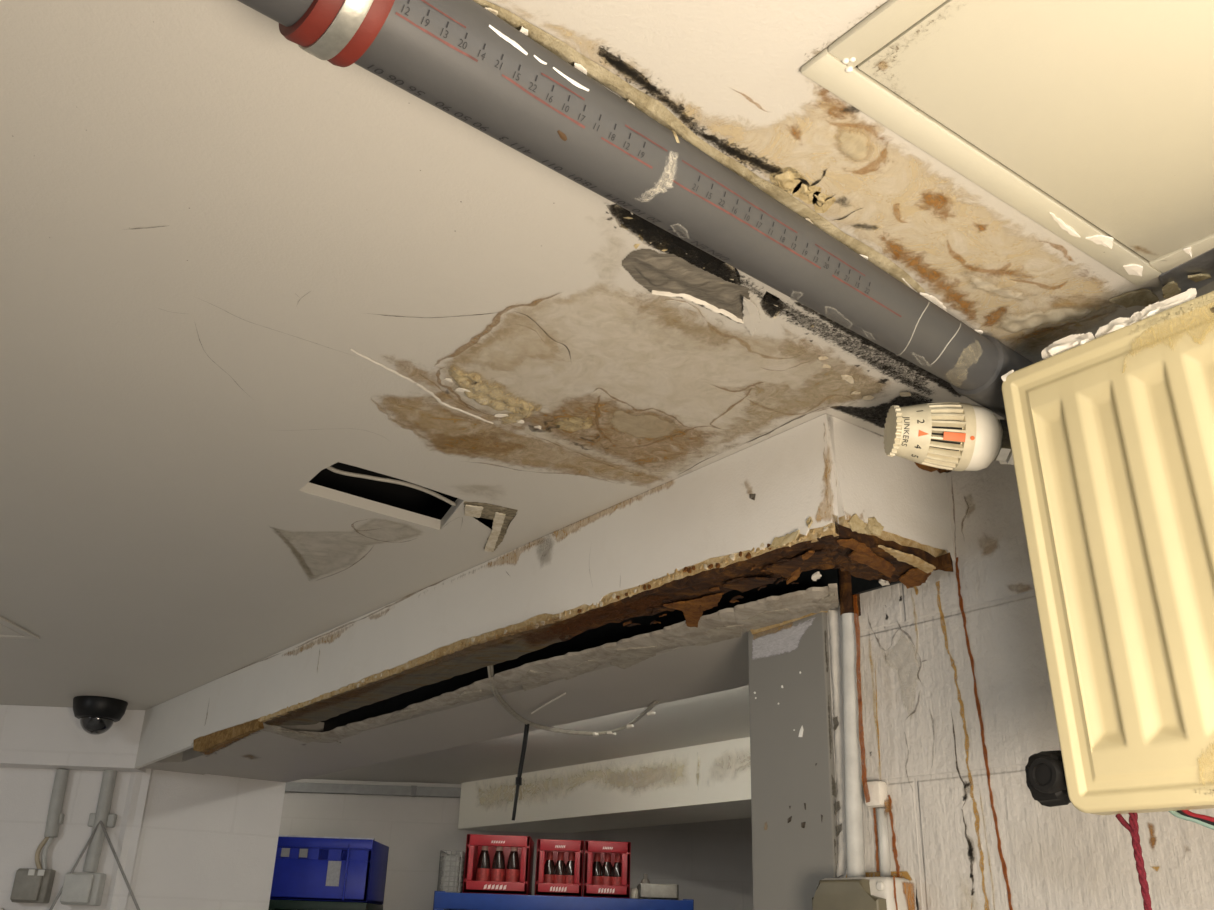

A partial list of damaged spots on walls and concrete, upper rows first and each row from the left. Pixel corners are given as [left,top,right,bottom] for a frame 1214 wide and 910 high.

leakage [796,90,1100,326]
leakage [394,295,961,488]
spalling [462,501,518,552]
spalling [236,514,947,877]
corrosion [193,522,1013,910]
crack [951,713,974,909]